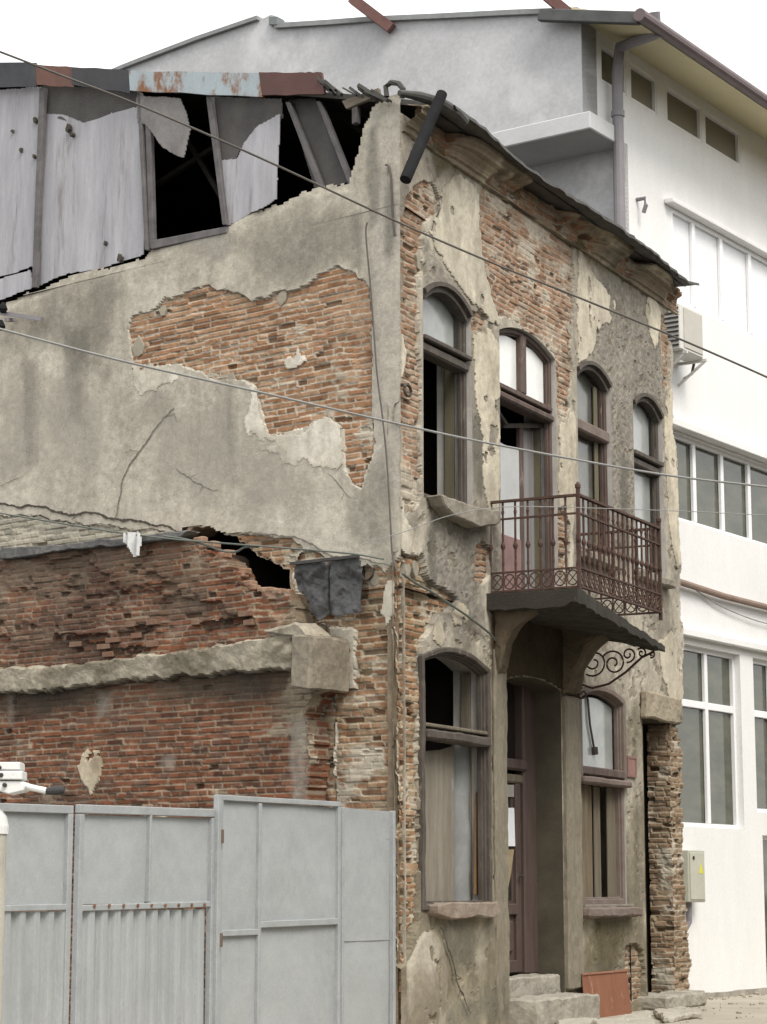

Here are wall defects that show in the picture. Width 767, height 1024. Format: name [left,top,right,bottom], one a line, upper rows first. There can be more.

spalling [129,267,375,486]
spalling [0,515,164,548]
crack [0,408,178,532]
spalling [53,619,160,658]
spalling [182,173,616,1024]
peeling [77,749,104,795]
spalling [669,723,692,991]